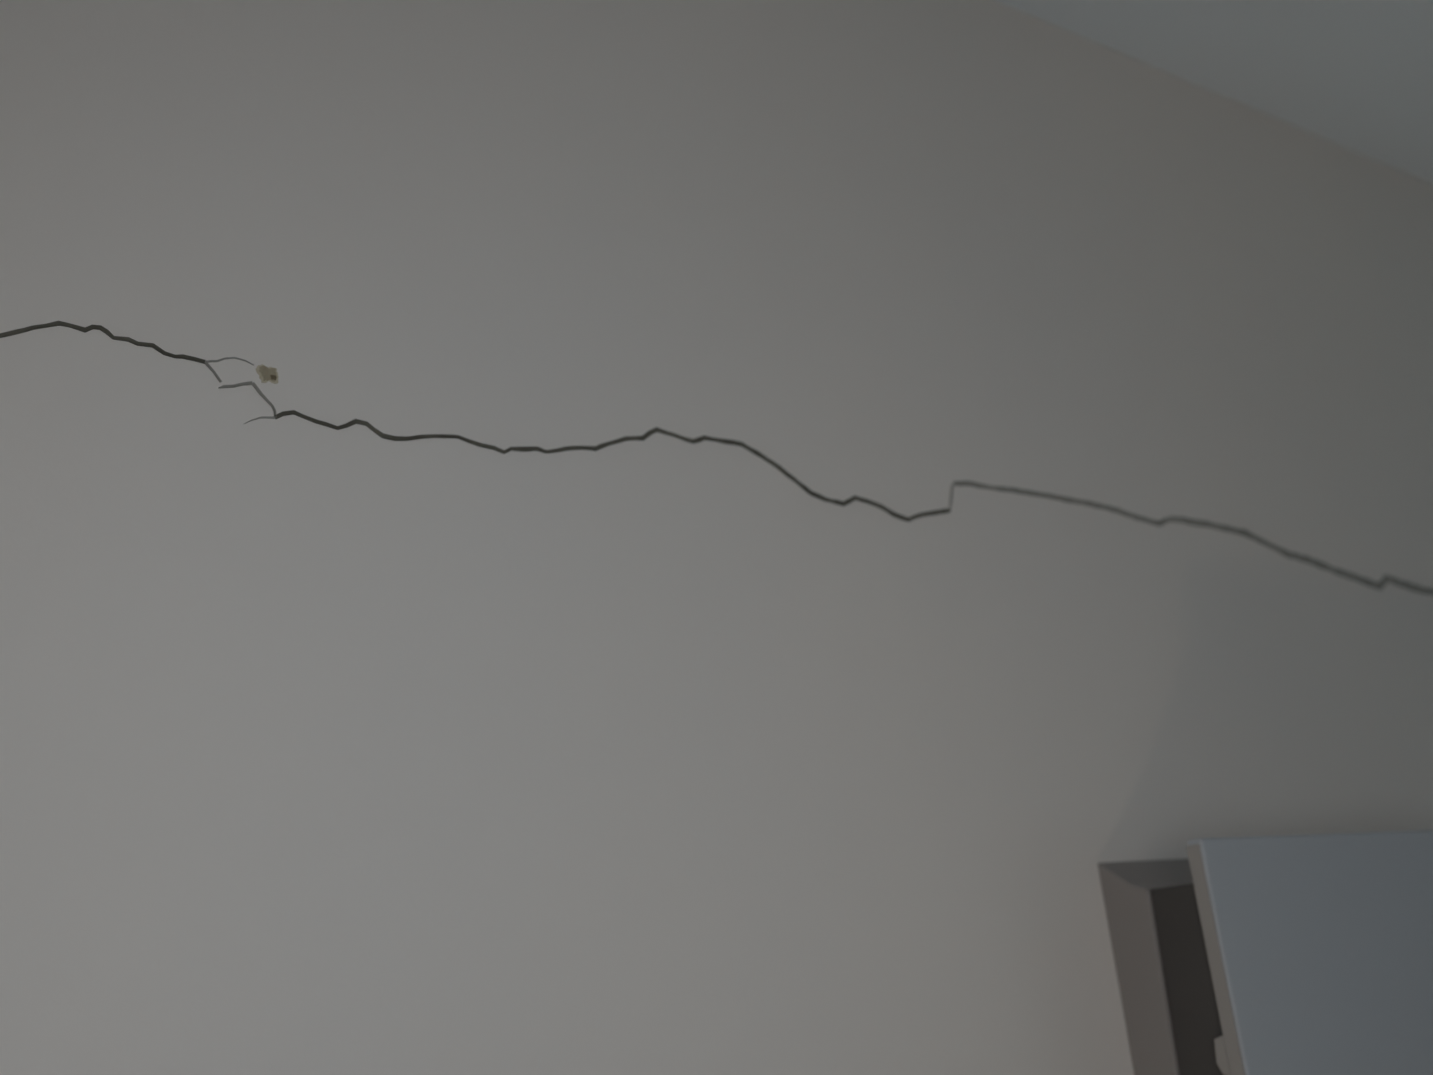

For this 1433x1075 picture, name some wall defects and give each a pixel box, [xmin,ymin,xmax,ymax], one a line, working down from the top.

crack [0,321,1433,595]